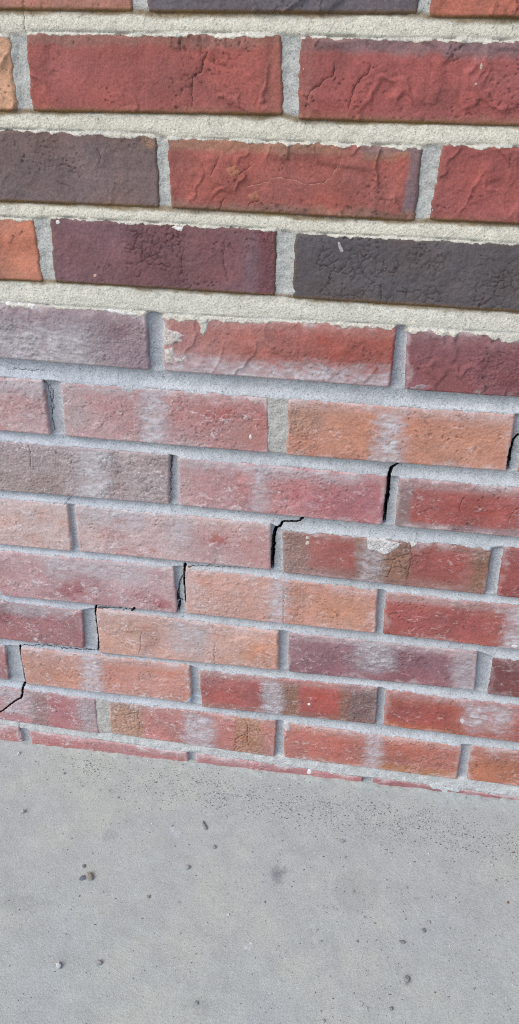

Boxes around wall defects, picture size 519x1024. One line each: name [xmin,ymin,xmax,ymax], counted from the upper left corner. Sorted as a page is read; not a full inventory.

crack [383,463,398,521]
crack [507,433,519,465]
crack [177,517,304,619]
crack [0,605,142,739]